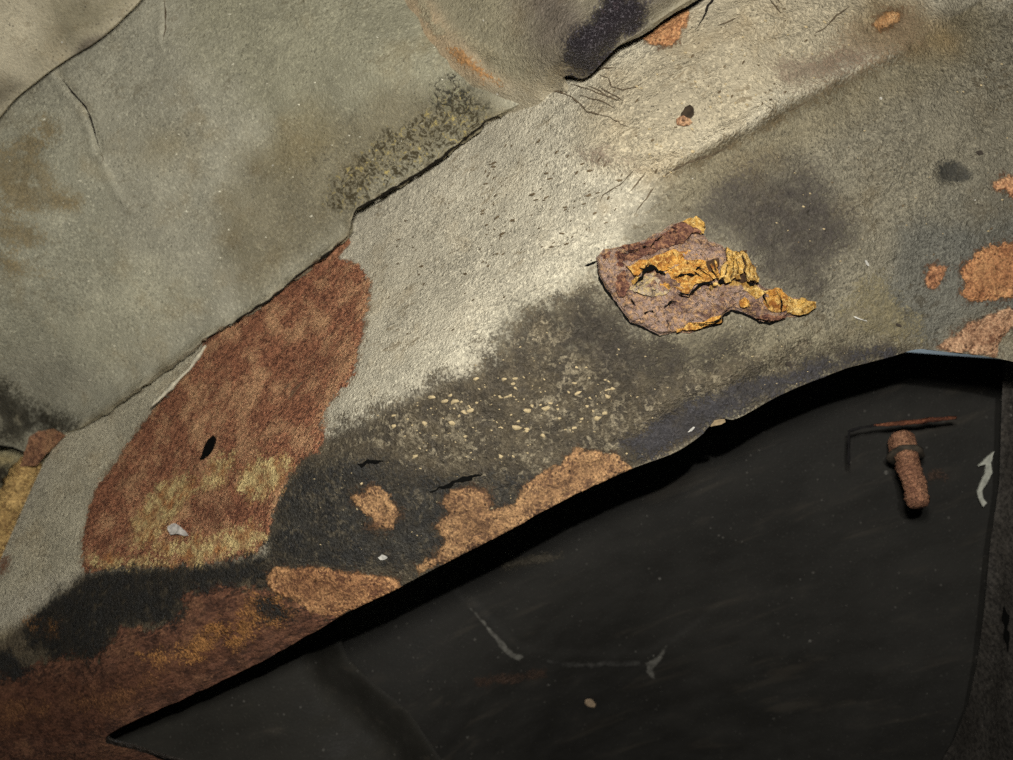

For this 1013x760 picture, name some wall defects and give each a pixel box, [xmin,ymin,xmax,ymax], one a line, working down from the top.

corrosion [642,9,690,50]
water stain [324,72,490,212]
spalling [434,144,523,307]
spalling [555,145,616,221]
corrosion [585,216,816,336]
corrosion [923,240,1013,358]
corrosion [80,238,373,574]
water stain [261,276,924,586]
corrosion [350,481,406,535]
corrosion [414,447,632,573]
corrosion [0,564,401,760]